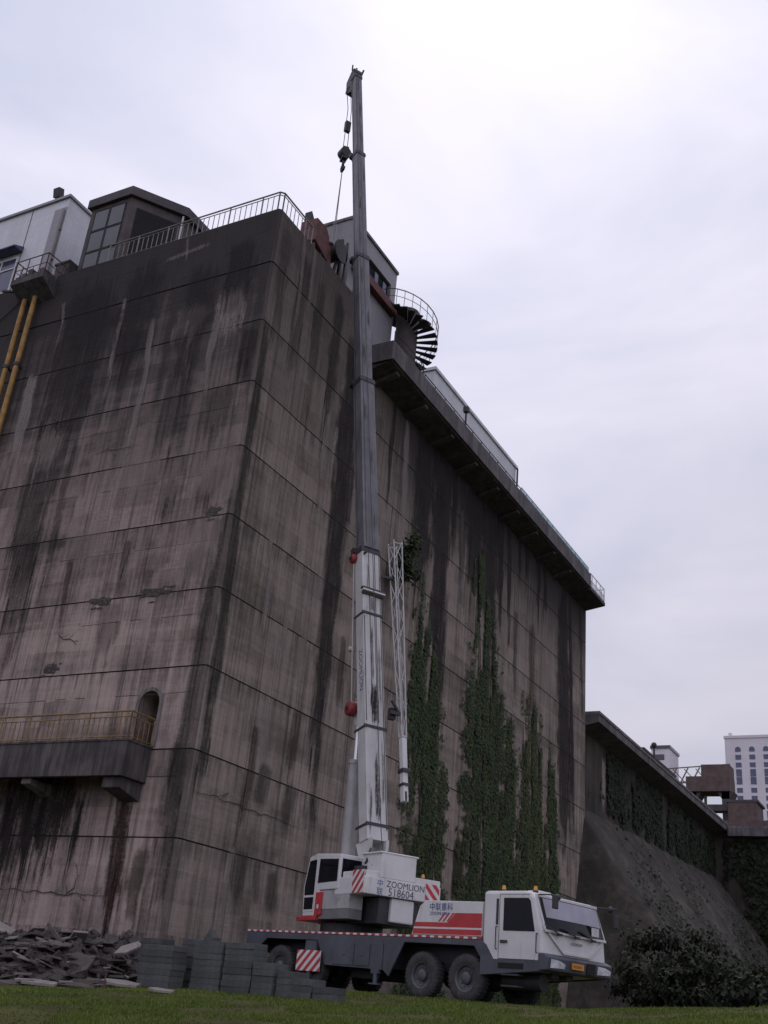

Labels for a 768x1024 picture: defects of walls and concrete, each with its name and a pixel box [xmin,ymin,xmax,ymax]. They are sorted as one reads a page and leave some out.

efflorescence [14,377,36,455]
leakage [309,299,355,782]
spalling [89,597,112,610]
spalling [140,585,176,603]
spalling [41,663,62,677]
leakage [411,429,583,863]
leakage [64,801,84,872]